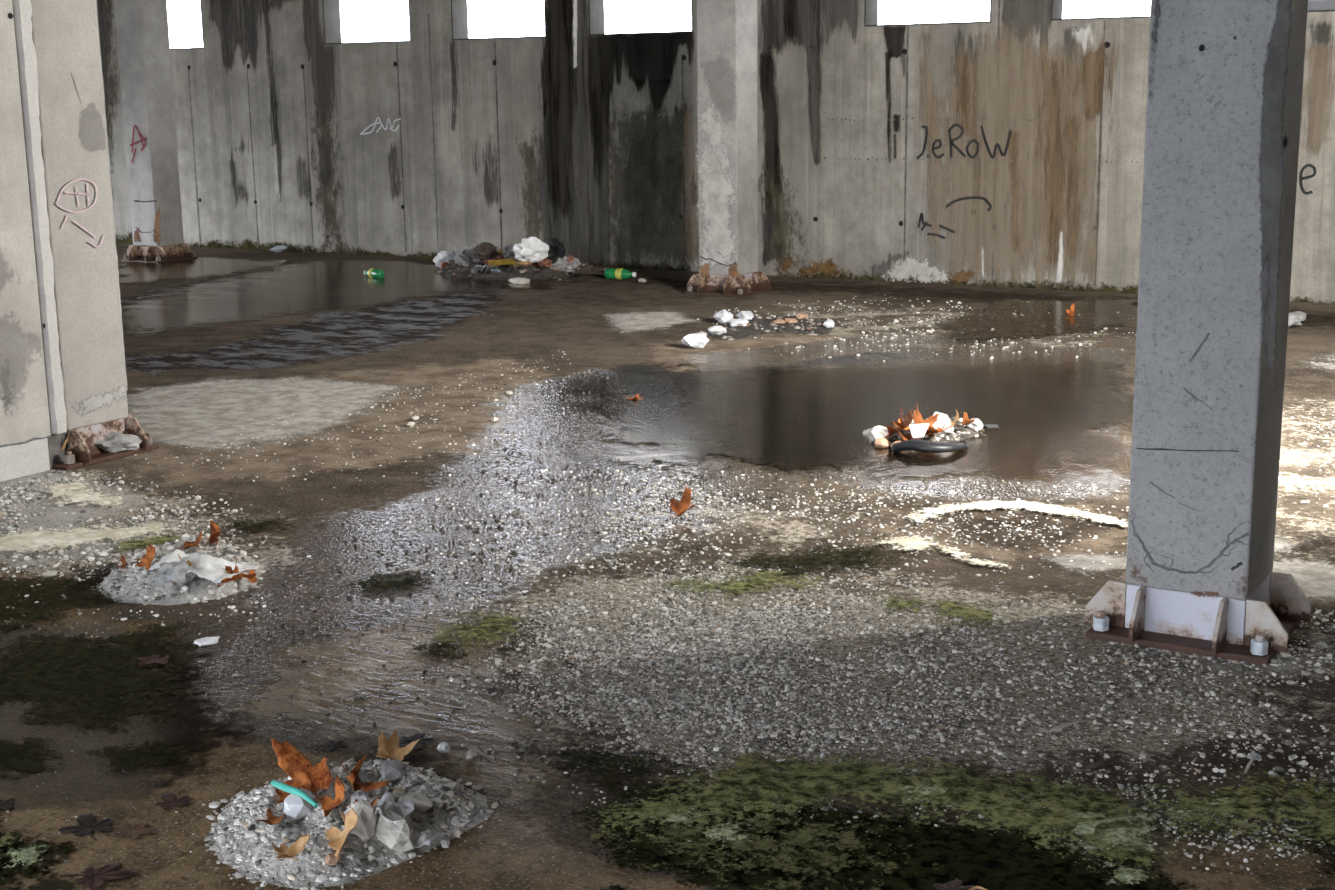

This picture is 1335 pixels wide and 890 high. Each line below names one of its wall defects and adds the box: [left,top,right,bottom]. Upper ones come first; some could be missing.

leakage [189,0,437,259]
leakage [450,41,460,130]
leakage [475,139,498,207]
leakage [520,0,697,287]
corrosion [776,256,852,278]
leakage [758,0,1138,307]
corrosion [920,24,1115,284]
crack [1131,515,1249,574]